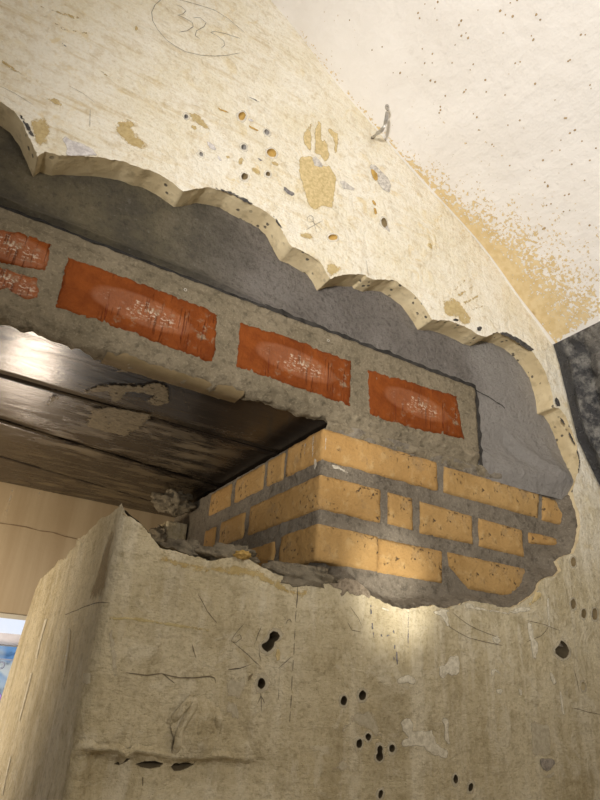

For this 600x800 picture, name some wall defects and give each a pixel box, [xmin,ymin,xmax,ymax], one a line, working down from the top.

peeling [63,137,97,156]
peeling [299,121,355,209]
peeling [347,91,600,343]
water stain [444,280,482,324]
crack [126,668,239,683]
flaking render [439,656,460,678]
flaking render [339,688,450,763]